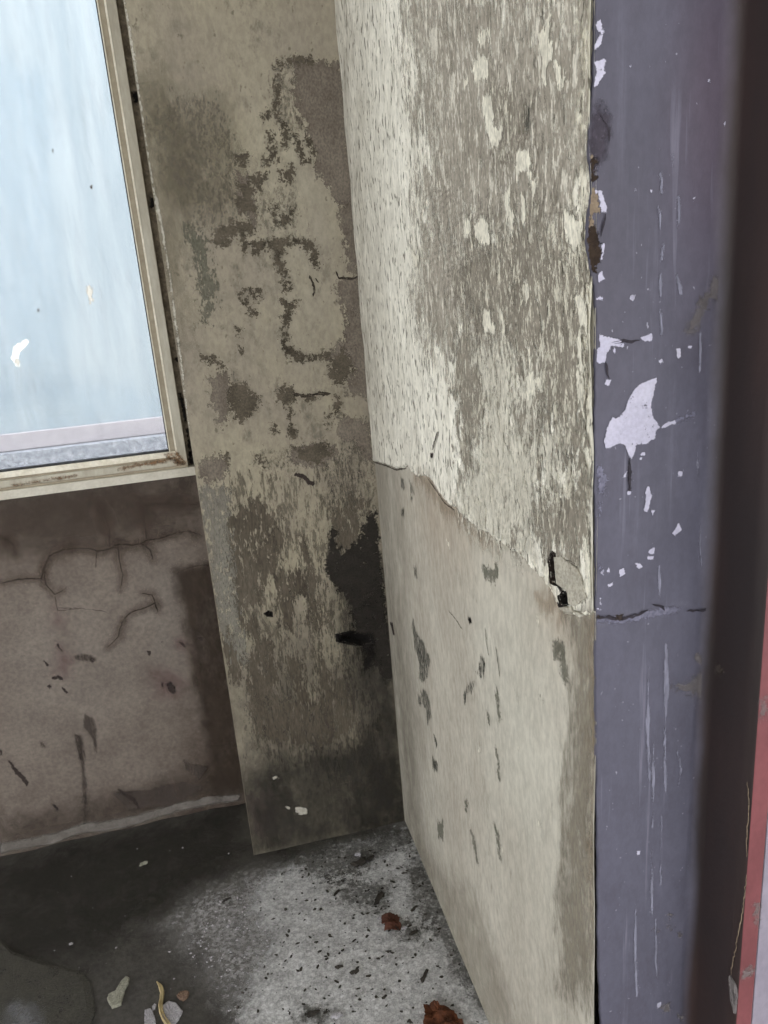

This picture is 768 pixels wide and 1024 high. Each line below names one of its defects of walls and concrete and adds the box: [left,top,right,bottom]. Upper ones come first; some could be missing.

damp [183,221,226,328]
peeling [393,0,655,615]
peeling [604,378,697,495]
crack [0,501,201,647]
damp [174,488,404,851]
crack [596,604,706,625]